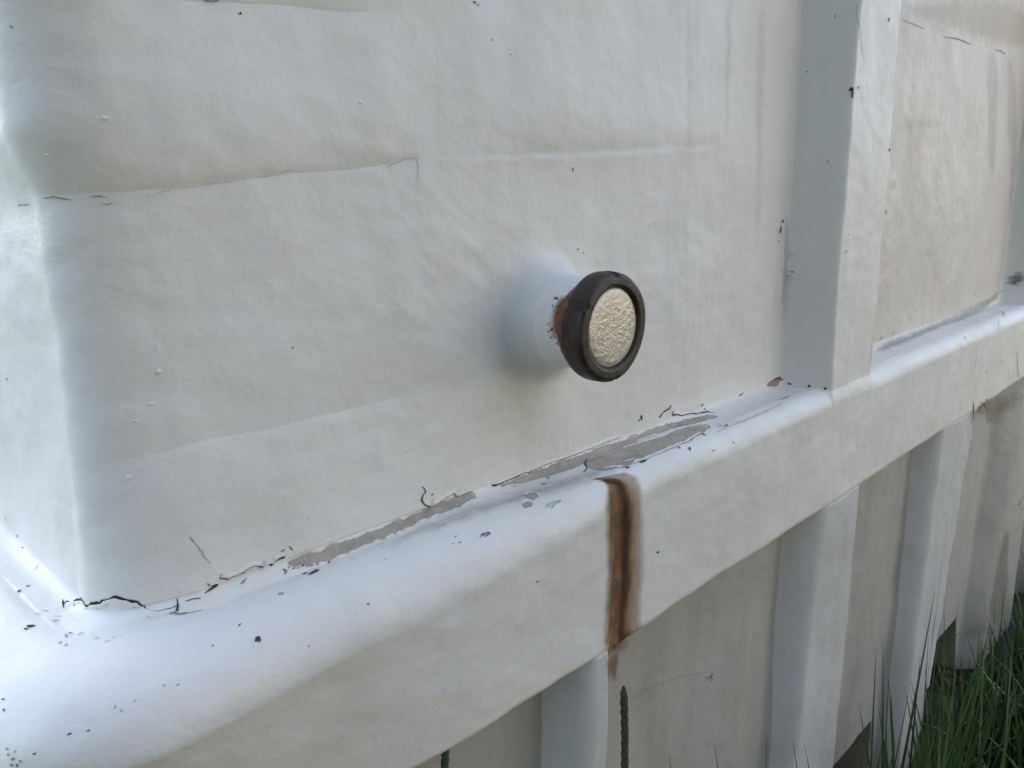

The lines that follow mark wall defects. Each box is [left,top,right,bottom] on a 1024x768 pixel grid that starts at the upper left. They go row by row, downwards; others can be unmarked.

corrosion [548,289,574,356]
peeling [501,404,728,511]
crack [62,546,293,619]
peeling [283,494,475,575]
corrosion [592,473,640,674]